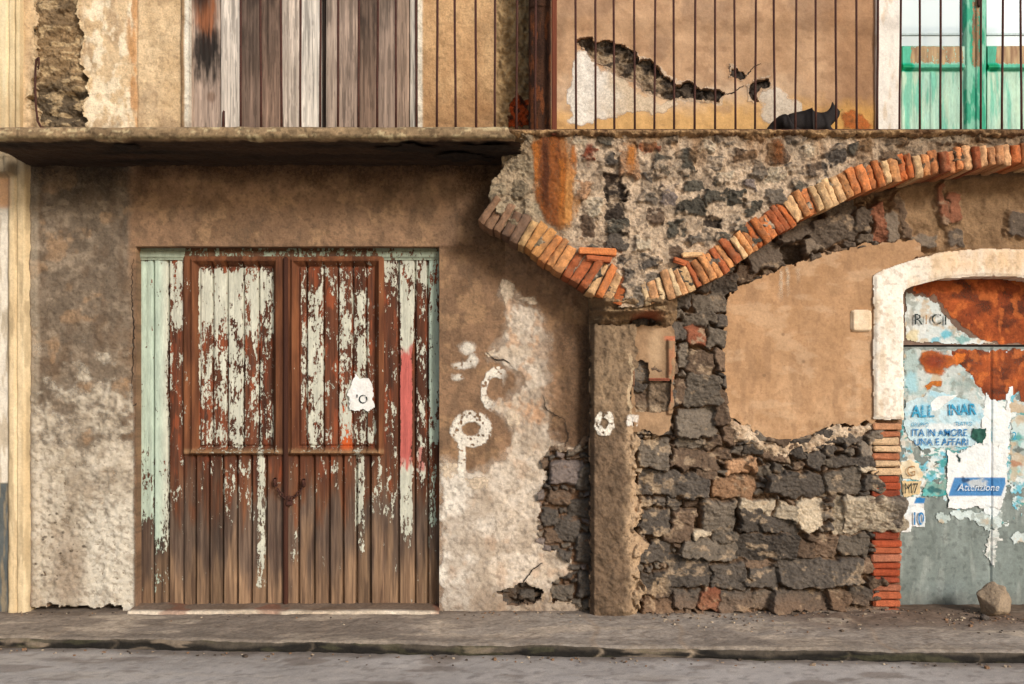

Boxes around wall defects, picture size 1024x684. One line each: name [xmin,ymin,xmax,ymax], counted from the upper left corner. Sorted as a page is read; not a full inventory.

flaking render [25,0,92,127]
peeling [567,37,725,126]
peeling [729,63,802,123]
rust [532,136,593,228]
rust [913,278,1024,402]
peeling [439,279,591,611]
crack [543,397,569,447]
flaking render [726,419,873,458]